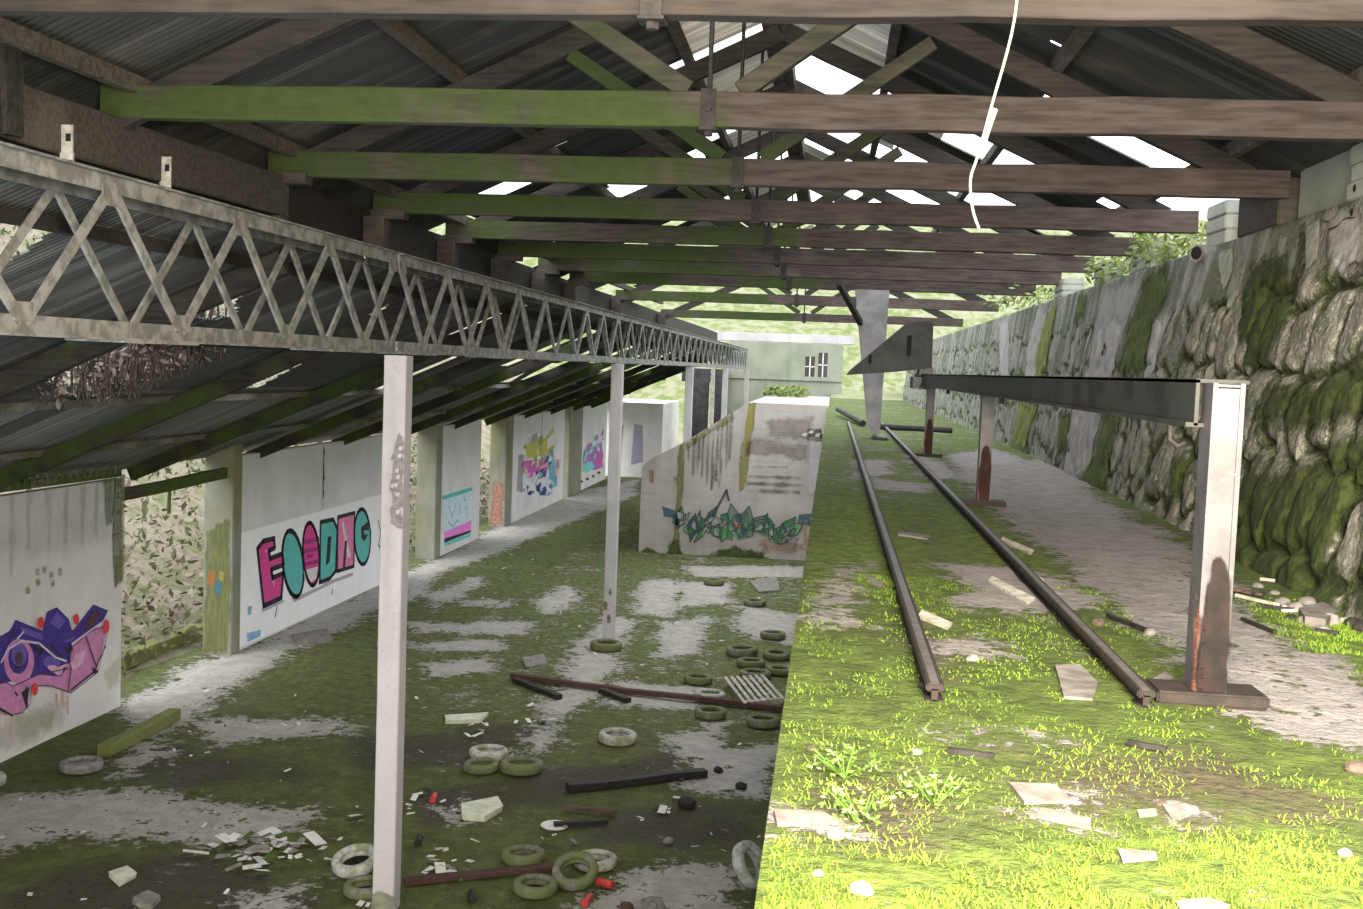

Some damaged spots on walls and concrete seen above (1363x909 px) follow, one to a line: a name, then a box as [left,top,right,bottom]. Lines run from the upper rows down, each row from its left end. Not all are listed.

water stain [673,403,822,549]
rust [977,446,991,501]
rust [1192,557,1231,693]